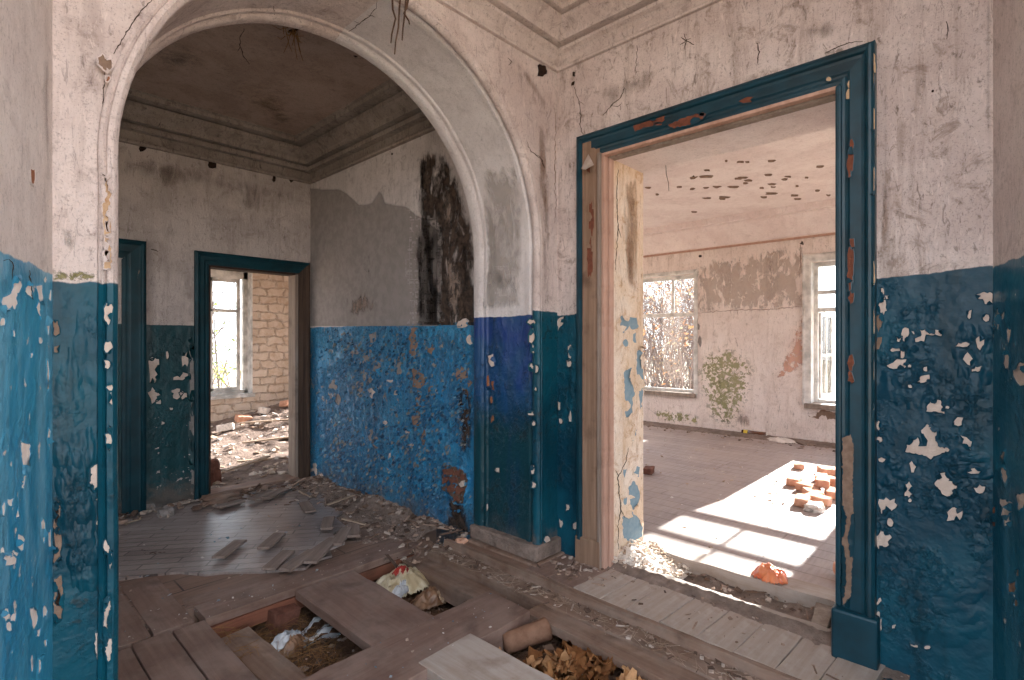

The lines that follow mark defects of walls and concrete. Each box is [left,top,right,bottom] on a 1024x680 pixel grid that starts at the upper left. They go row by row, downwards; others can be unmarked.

crack [102,0,152,104]
peeling [677,160,824,200]
damp [310,163,466,326]
peeling [0,441,32,566]
peeling [0,275,61,392]
peeling [310,318,496,517]
damp [708,363,728,421]
peeling [867,261,944,389]
peeling [877,398,973,550]
peeling [933,466,986,522]
peeling [955,290,1024,387]
peeling [1,499,65,675]